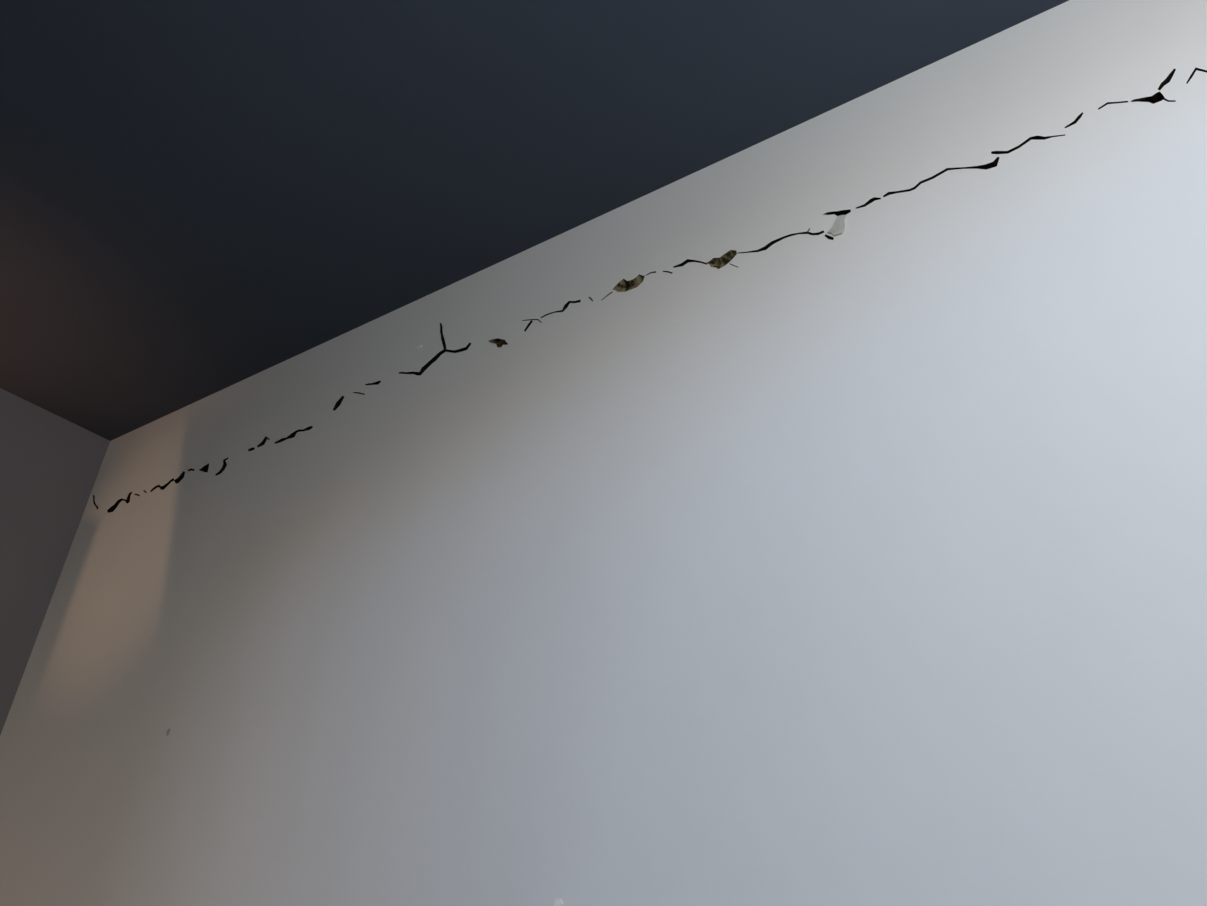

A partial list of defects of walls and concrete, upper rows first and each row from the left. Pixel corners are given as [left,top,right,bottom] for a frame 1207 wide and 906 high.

crack [856,68,1207,209]
crack [738,228,824,253]
crack [646,259,707,276]
crack [522,292,612,331]
crack [93,323,471,513]